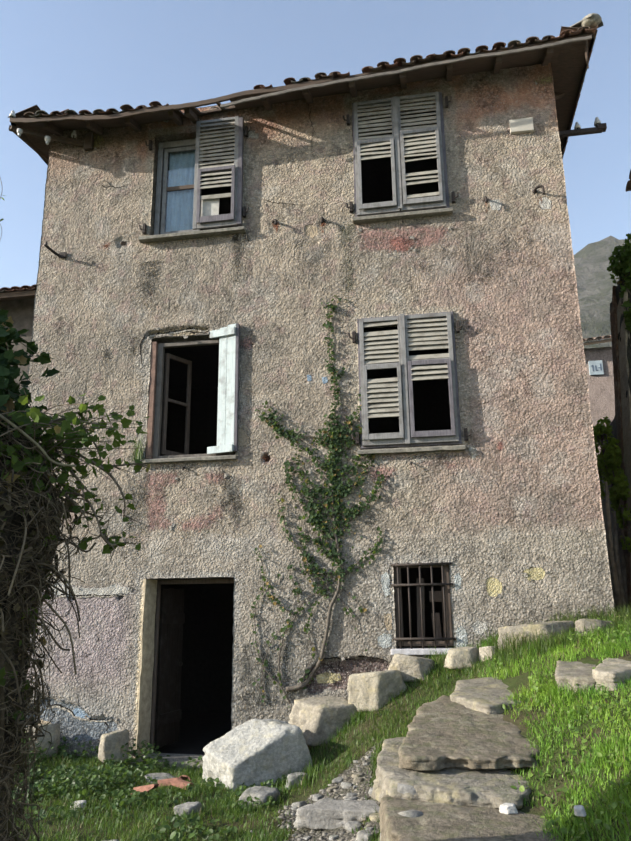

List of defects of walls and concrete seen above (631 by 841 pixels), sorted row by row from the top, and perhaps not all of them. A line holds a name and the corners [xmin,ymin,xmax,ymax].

flaking render [27,696,119,743]